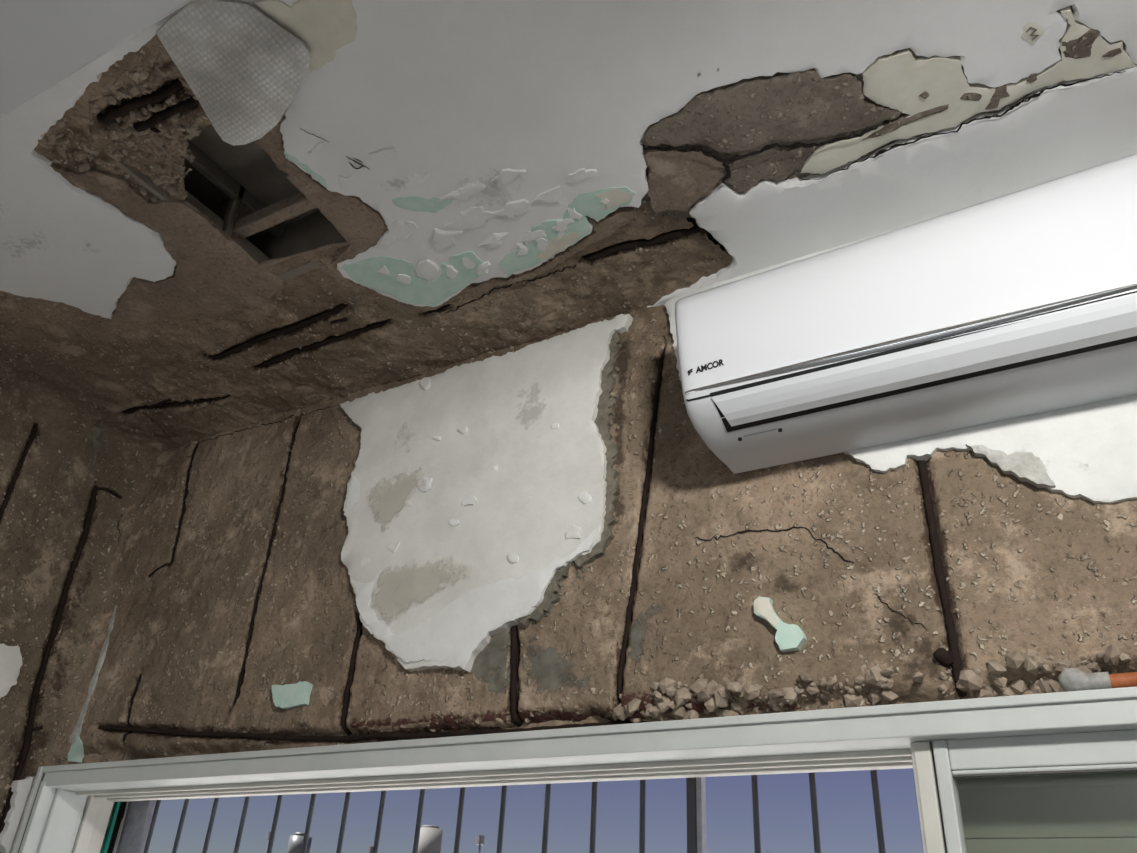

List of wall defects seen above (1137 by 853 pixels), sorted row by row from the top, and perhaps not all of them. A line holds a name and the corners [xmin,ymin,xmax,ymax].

spalling [641,5,1136,219]
spalling [0,377,152,853]
spalling [0,34,733,765]
spalling [98,220,1137,744]